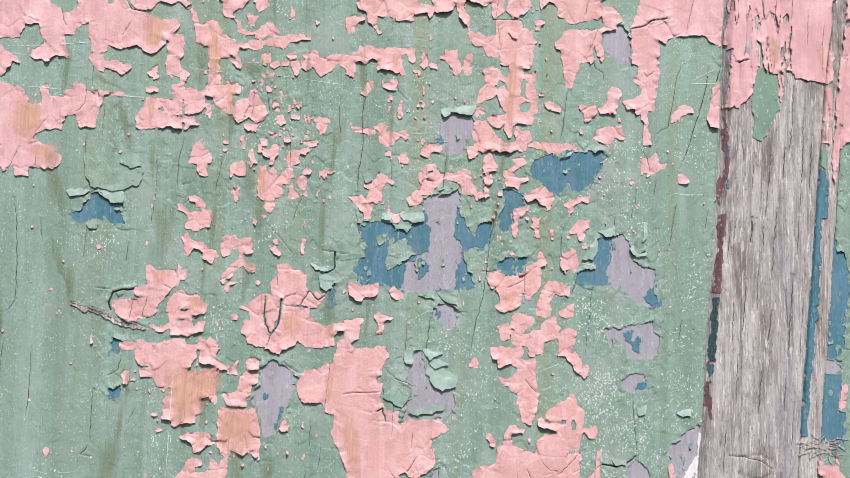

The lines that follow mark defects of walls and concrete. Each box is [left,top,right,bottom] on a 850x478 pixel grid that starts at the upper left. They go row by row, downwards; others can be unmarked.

peeling [0,0,473,229]
crack [681,59,748,165]
crack [96,287,147,327]
peeling [70,262,458,478]
peeling [343,0,850,478]